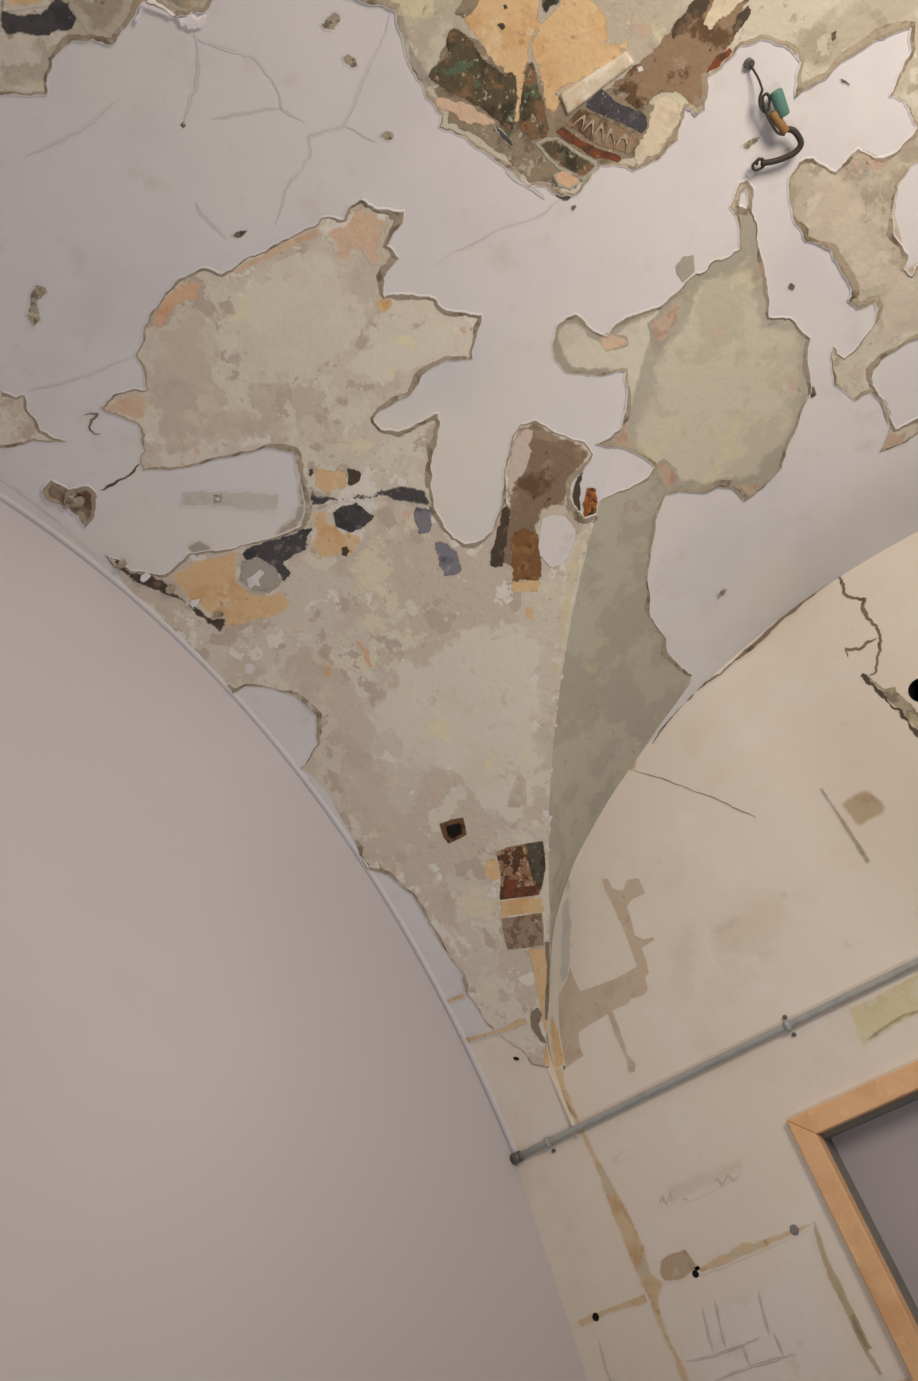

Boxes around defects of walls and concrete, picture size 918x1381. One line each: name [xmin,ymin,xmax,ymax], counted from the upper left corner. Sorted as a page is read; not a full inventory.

peeling [0,0,215,98]
crack [24,100,119,158]
crack [183,14,391,225]
spalling [25,283,49,331]
peeling [0,391,68,449]
spalling [40,478,98,528]
peeling [99,0,918,1068]
crack [634,577,918,818]